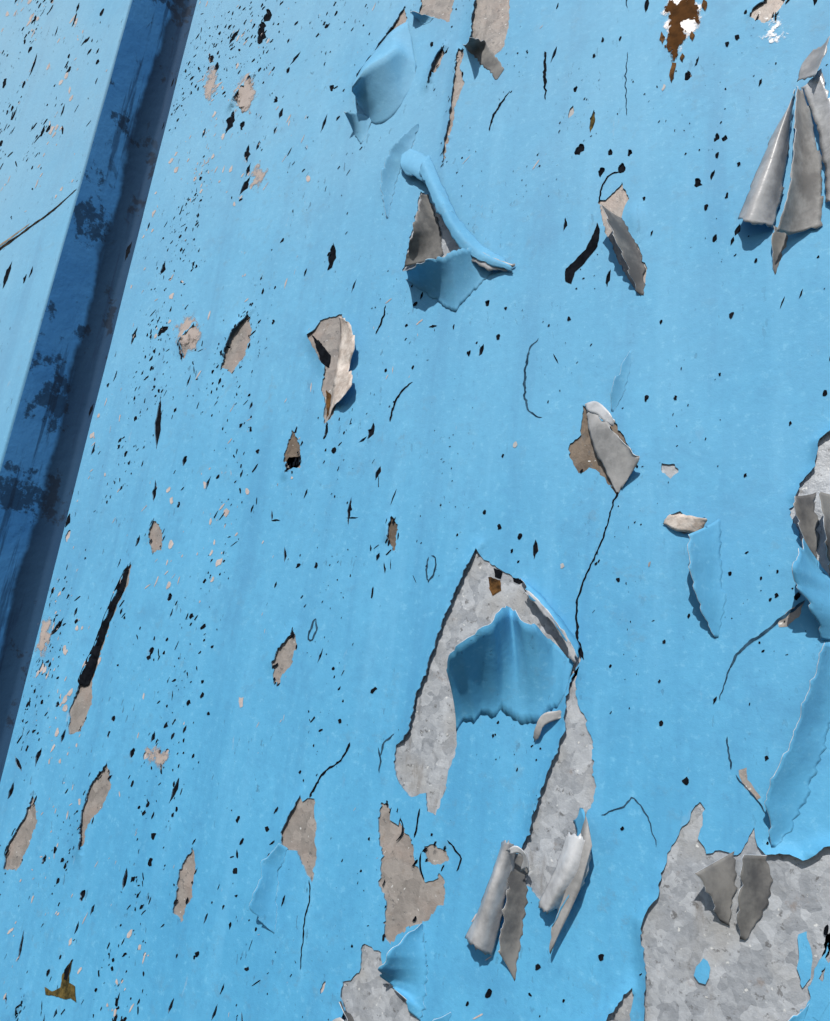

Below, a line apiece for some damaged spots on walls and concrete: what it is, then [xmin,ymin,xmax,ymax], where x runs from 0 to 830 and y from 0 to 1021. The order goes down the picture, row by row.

peeling [344,0,454,144]
corrosion [659,0,707,82]
crack [0,190,75,250]
peeling [380,124,515,312]
peeling [565,150,647,296]
peeling [730,36,830,274]
peeling [308,315,355,436]
peeling [569,351,640,494]
crack [575,492,618,659]
peeling [333,550,596,1021]
peeling [607,431,830,1021]
corrosion [45,959,76,1002]